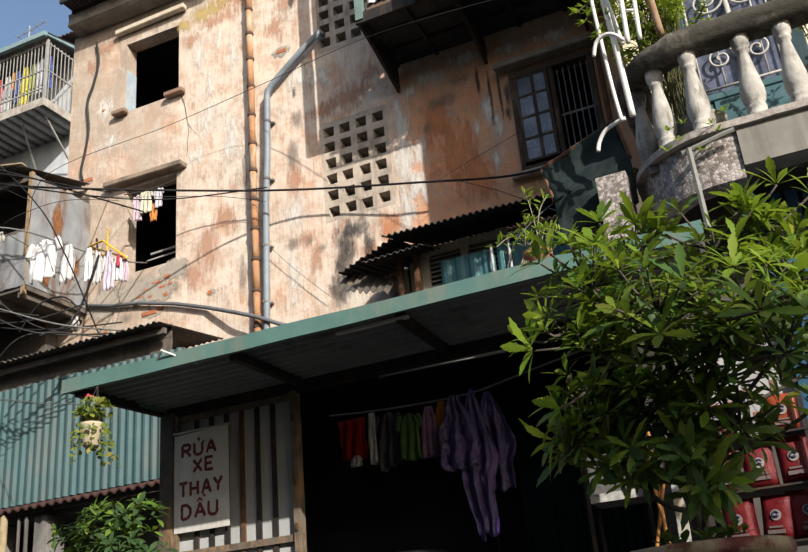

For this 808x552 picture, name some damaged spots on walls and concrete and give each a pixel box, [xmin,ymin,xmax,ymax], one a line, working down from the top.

flaking render [272,46,290,57]
water stain [475,69,511,136]
peeling [219,207,236,226]
peeling [87,230,218,336]
water stain [330,221,373,300]